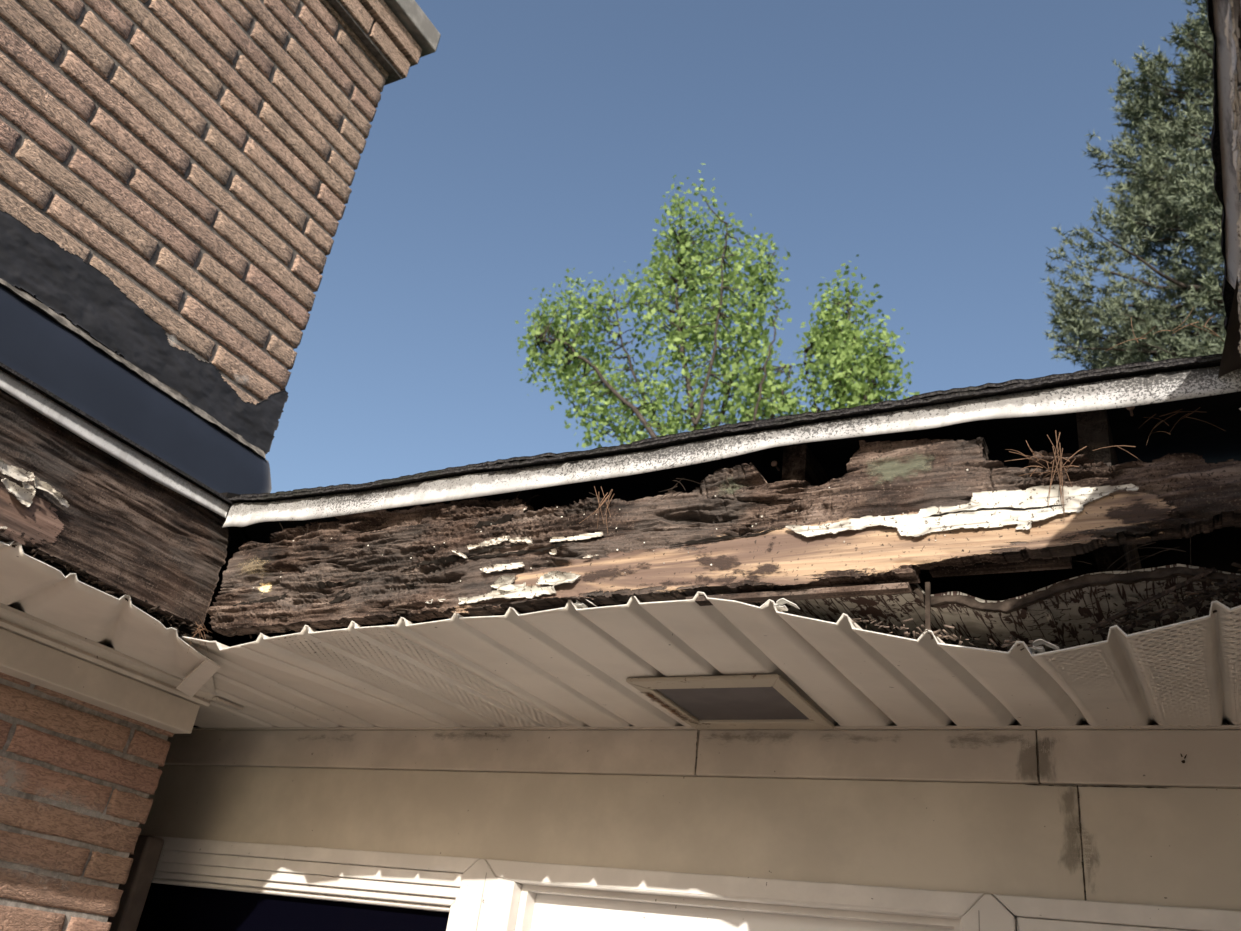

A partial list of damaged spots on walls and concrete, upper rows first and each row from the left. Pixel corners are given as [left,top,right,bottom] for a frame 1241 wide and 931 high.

peeling [1225,0,1241,354]
peeling [0,458,69,546]
peeling [425,484,1177,614]